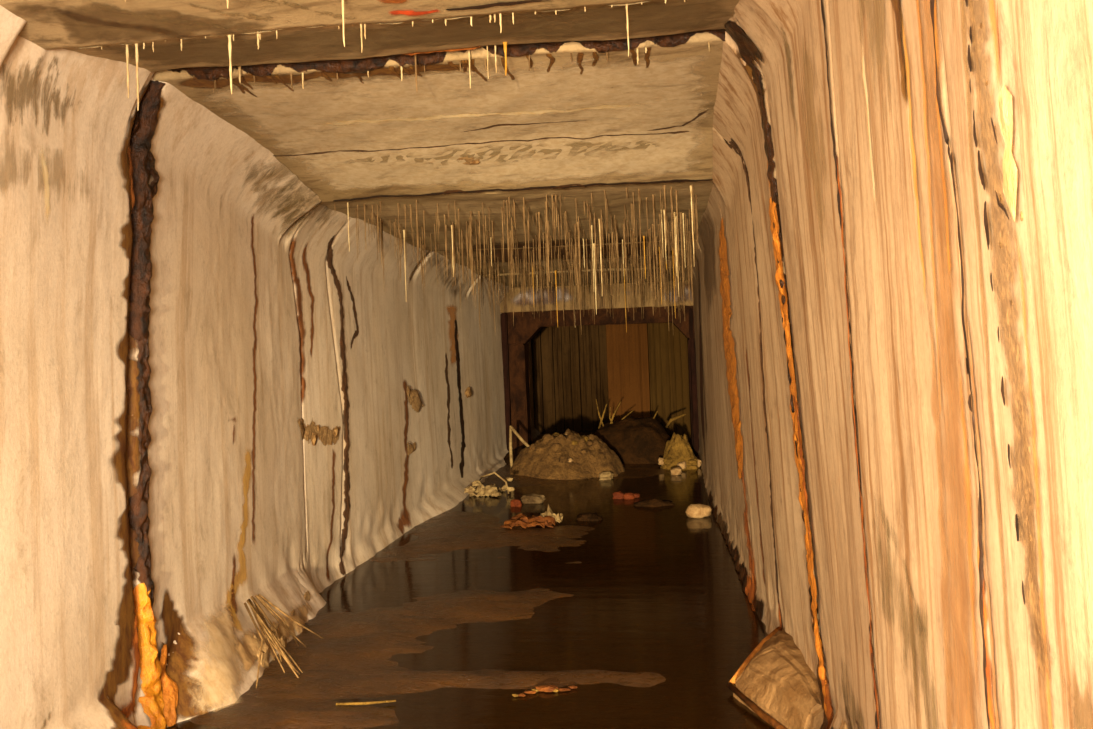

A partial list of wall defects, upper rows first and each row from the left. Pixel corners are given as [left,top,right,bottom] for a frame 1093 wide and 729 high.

damp [20,0,730,64]
damp [3,59,68,134]
damp [473,236,674,262]
crack [98,20,828,729]
crack [821,0,879,729]